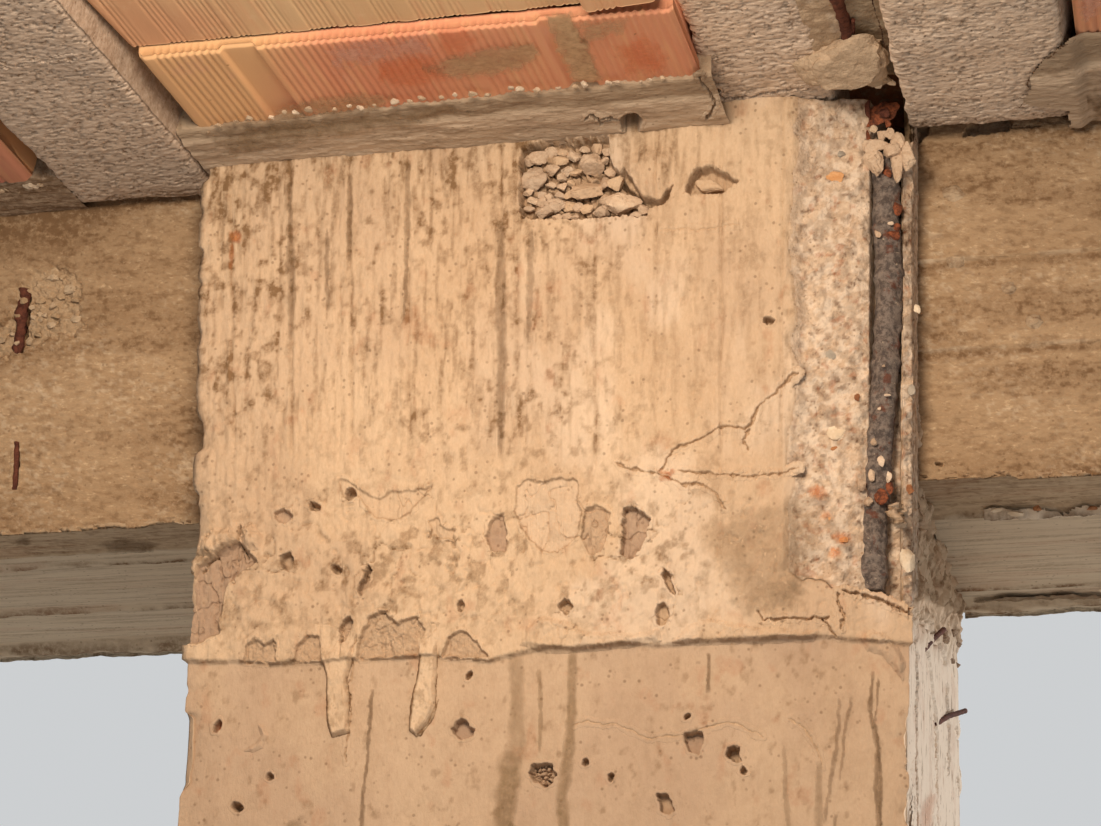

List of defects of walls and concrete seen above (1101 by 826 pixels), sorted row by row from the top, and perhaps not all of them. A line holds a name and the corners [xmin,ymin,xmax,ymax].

corrosion [829,0,855,40]
corrosion [862,100,916,183]
corrosion [11,287,35,356]
spalling [786,98,935,609]
corrosion [8,438,23,493]
crack [611,366,805,514]
peeling [334,474,458,545]
peeling [481,473,656,563]
crack [885,502,921,529]
spalling [187,539,259,647]
hole [651,564,680,629]
hole [722,741,751,778]